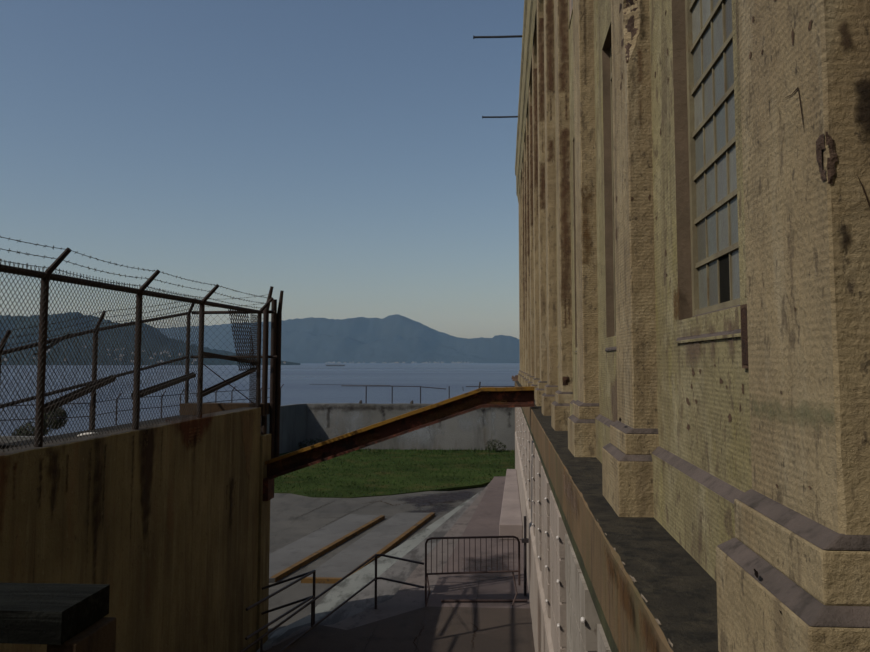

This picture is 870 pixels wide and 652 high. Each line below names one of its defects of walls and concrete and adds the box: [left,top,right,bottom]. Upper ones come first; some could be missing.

spalling [619,0,644,62]
damp [839,20,852,48]
damp [855,78,870,138]
spalling [816,131,838,184]